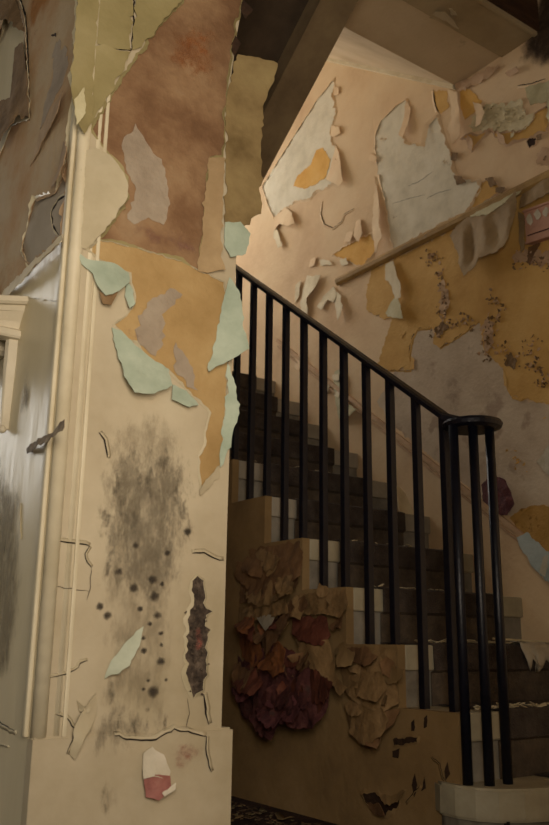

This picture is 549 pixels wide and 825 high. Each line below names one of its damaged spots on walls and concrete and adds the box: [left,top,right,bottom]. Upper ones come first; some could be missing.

spalling [0,0,343,496]
peeling [295,65,549,582]
damp [0,489,21,669]
spalling [181,573,214,700]
crack [0,722,17,735]
peeling [143,747,176,801]
crack [113,693,214,772]